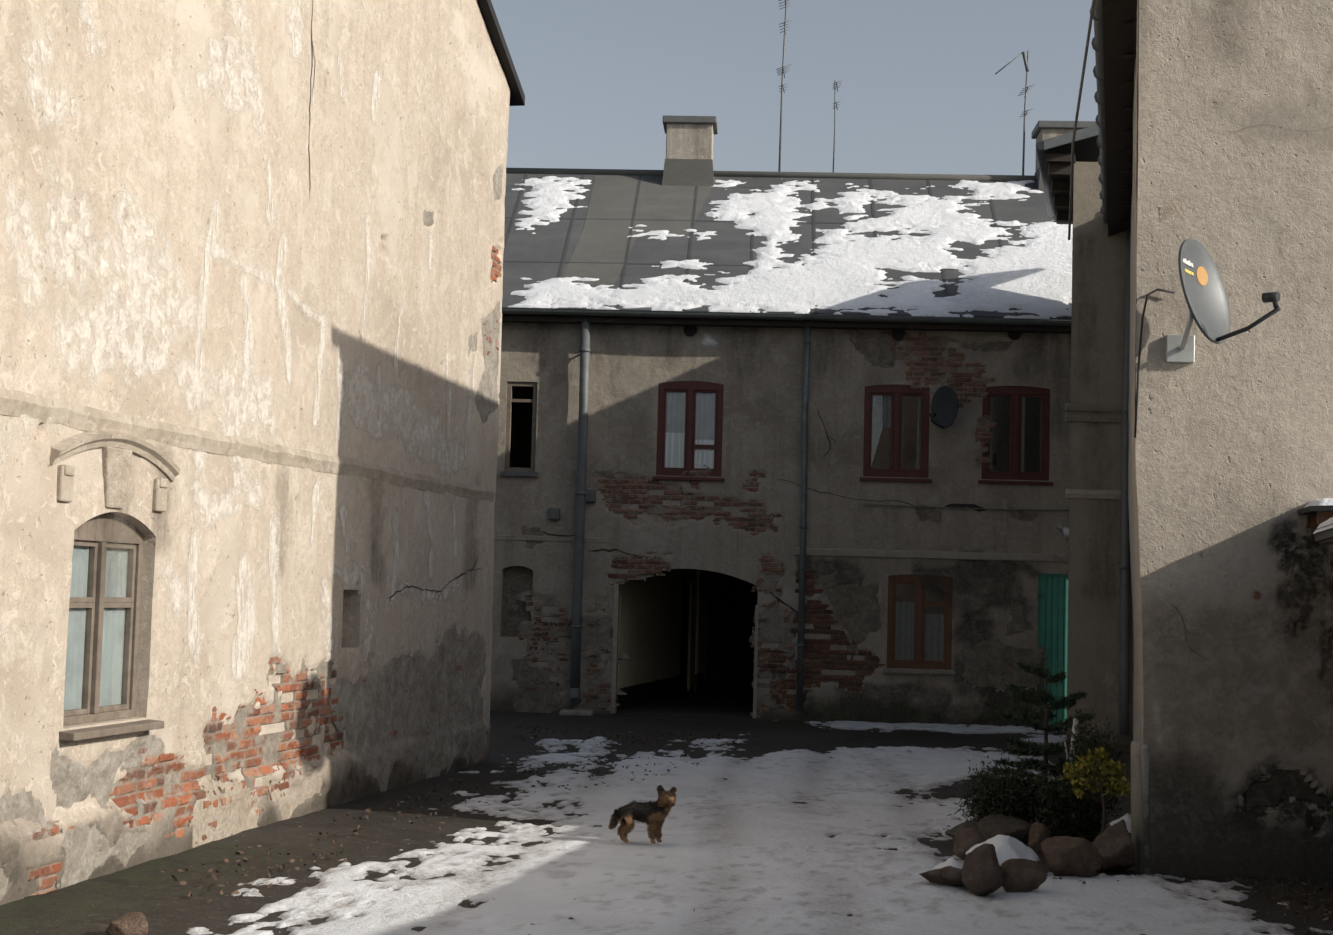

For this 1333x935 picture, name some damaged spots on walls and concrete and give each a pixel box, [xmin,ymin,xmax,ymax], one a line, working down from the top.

crack [308,10,316,187]
water stain [5,160,476,475]
flaking render [423,210,434,227]
flaking render [468,301,501,424]
flaking render [490,245,502,283]
flaking render [843,329,1013,407]
flaking render [593,465,784,536]
crack [389,555,480,604]
flaking render [511,590,629,713]
flaking render [758,556,886,712]
water stain [1146,515,1333,882]
flaking render [0,623,487,901]